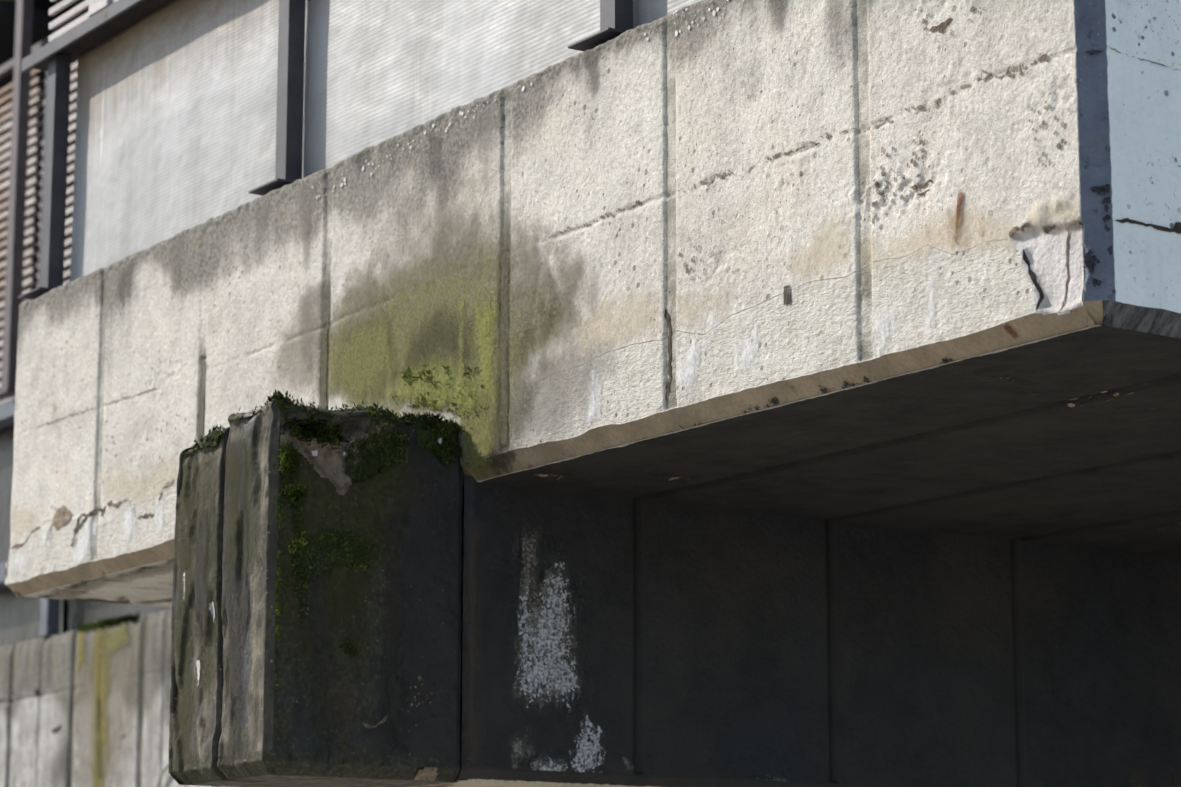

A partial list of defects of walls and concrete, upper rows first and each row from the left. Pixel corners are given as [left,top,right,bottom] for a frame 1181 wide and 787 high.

crack [549,200,643,239]
rust [954,192,964,243]
leakage [320,269,329,409]
leakage [487,194,514,474]
crack [664,309,672,400]
spalling [280,411,371,495]
spalling [52,505,72,530]
leakage [513,532,579,708]
leakage [569,715,604,772]